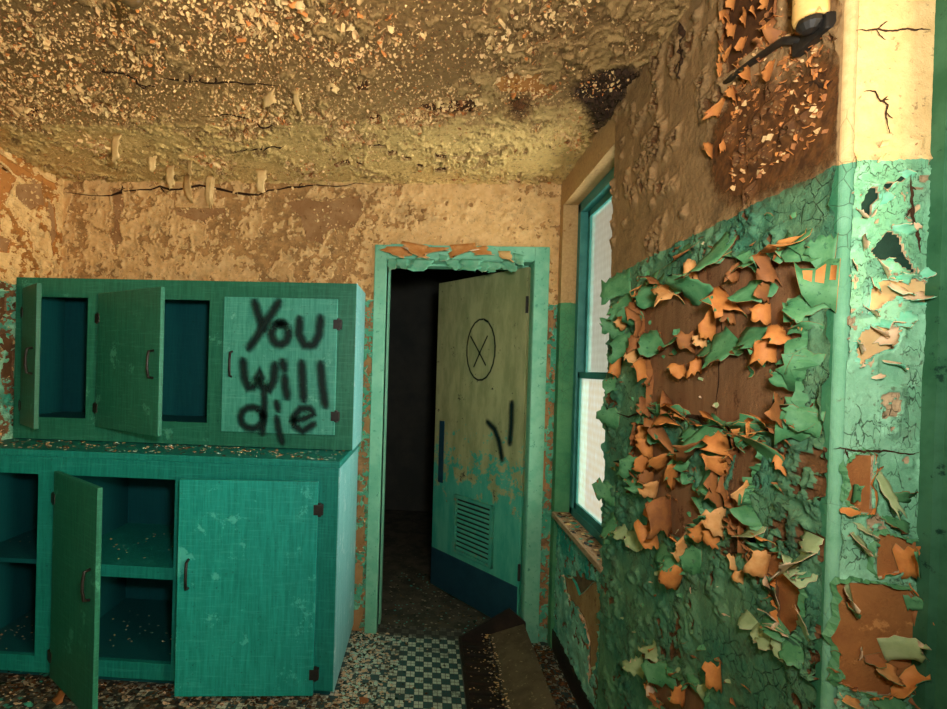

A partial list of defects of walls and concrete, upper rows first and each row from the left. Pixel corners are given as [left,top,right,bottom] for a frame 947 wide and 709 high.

crack [859,21,931,40]
peeling [0,0,672,290]
spalling [702,0,831,191]
crack [864,90,892,134]
spalling [856,169,917,218]
peeling [0,272,16,378]
spalling [849,222,938,380]
peeling [592,228,841,669]
peeling [355,476,368,586]
peeling [561,574,600,683]
peeling [622,630,751,709]
peeling [822,447,931,709]